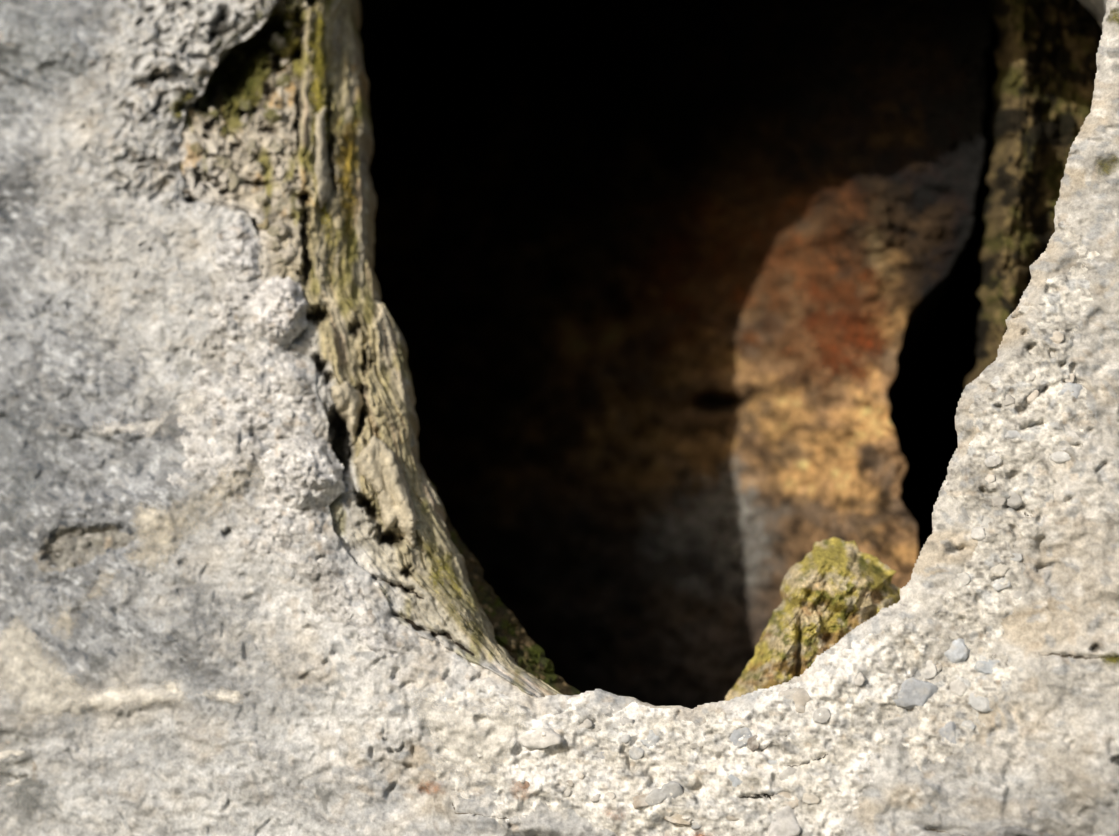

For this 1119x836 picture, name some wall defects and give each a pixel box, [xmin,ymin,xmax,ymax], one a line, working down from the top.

spalling [183,0,274,97]
spalling [190,16,302,285]
peeling [314,106,330,209]
spalling [167,256,420,661]
spalling [425,221,1100,836]